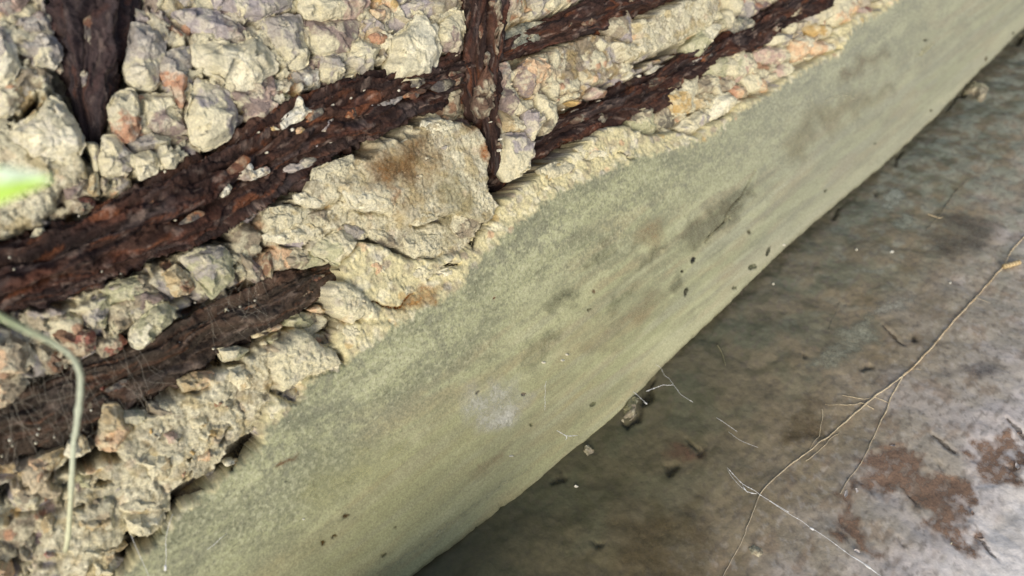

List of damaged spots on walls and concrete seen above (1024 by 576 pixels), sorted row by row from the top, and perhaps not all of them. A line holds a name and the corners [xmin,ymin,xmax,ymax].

corrosion [0,0,674,326]
corrosion [531,0,835,162]
spalling [618,0,874,136]
corrosion [0,263,336,465]
spalling [0,0,778,576]